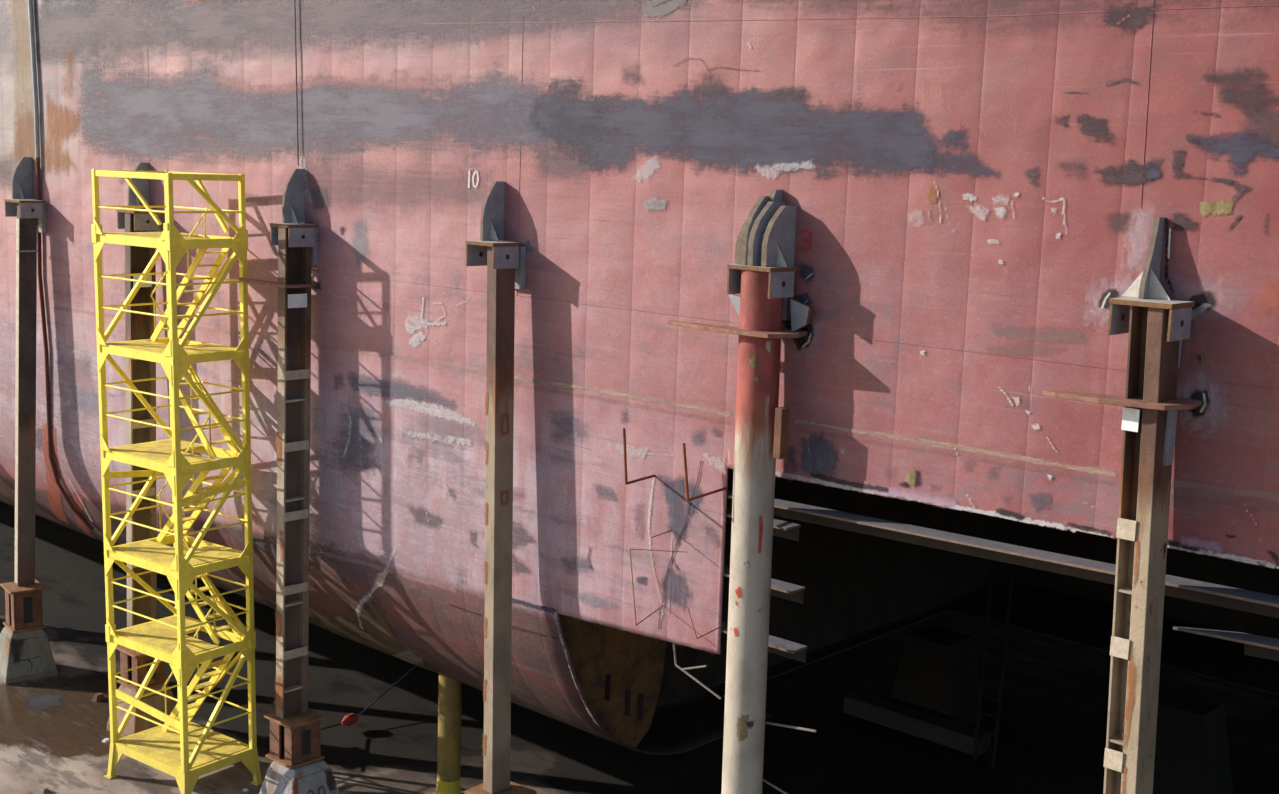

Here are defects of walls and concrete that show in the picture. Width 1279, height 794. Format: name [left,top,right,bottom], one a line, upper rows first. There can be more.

peeling [37,0,999,179]
peeling [1103,3,1157,34]
peeling [1057,68,1279,230]